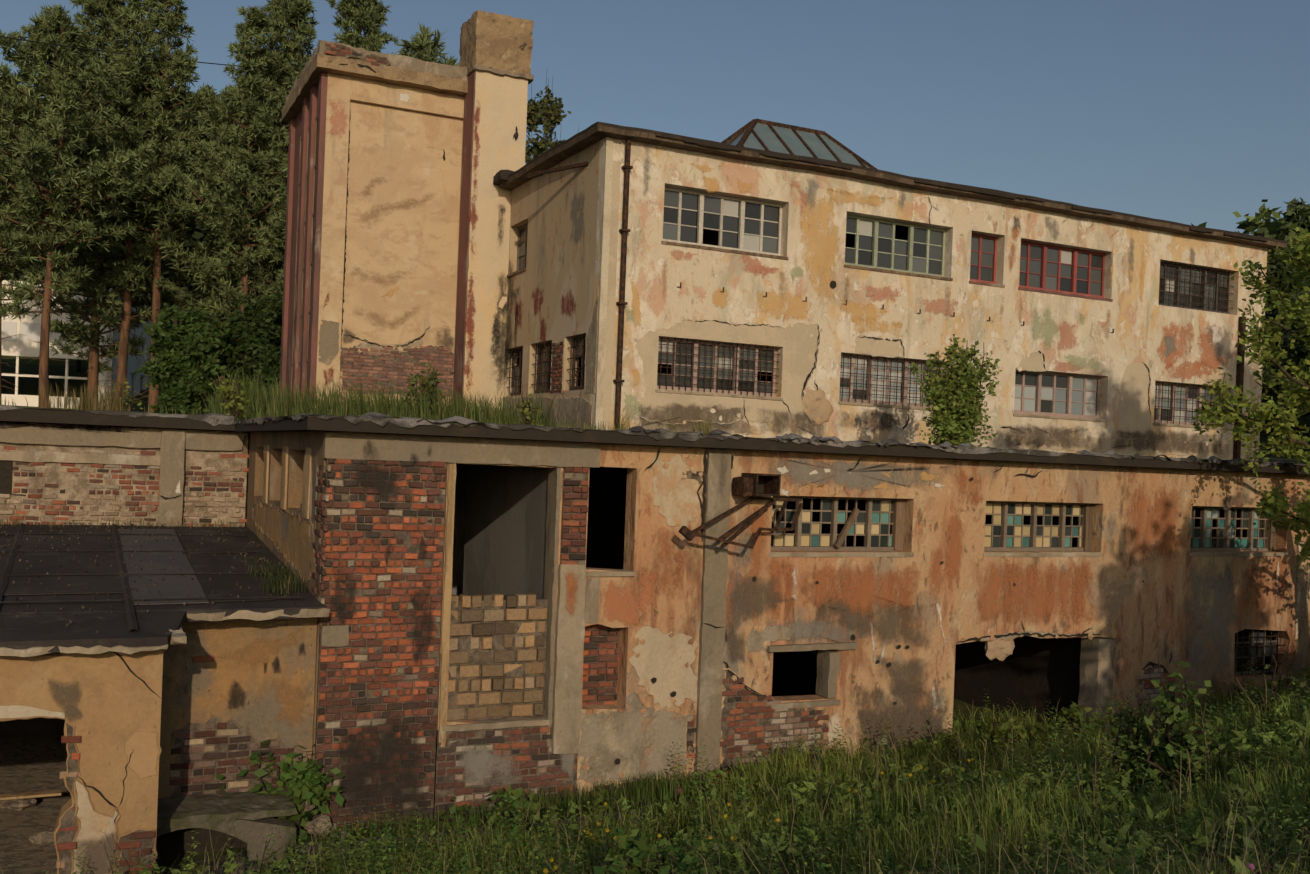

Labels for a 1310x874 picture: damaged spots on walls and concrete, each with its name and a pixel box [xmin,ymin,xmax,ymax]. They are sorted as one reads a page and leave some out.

crack [341,111,430,350]
flaking render [317,319,454,397]
water stain [491,263,546,382]
flaking render [1007,362,1229,458]
peeling [1157,323,1226,380]
flaking render [650,453,705,529]
corrosion [889,518,962,628]
crack [112,651,161,698]
flaking render [577,624,699,799]
flaking render [720,667,836,771]
flaking render [0,703,158,874]
crack [77,750,134,824]